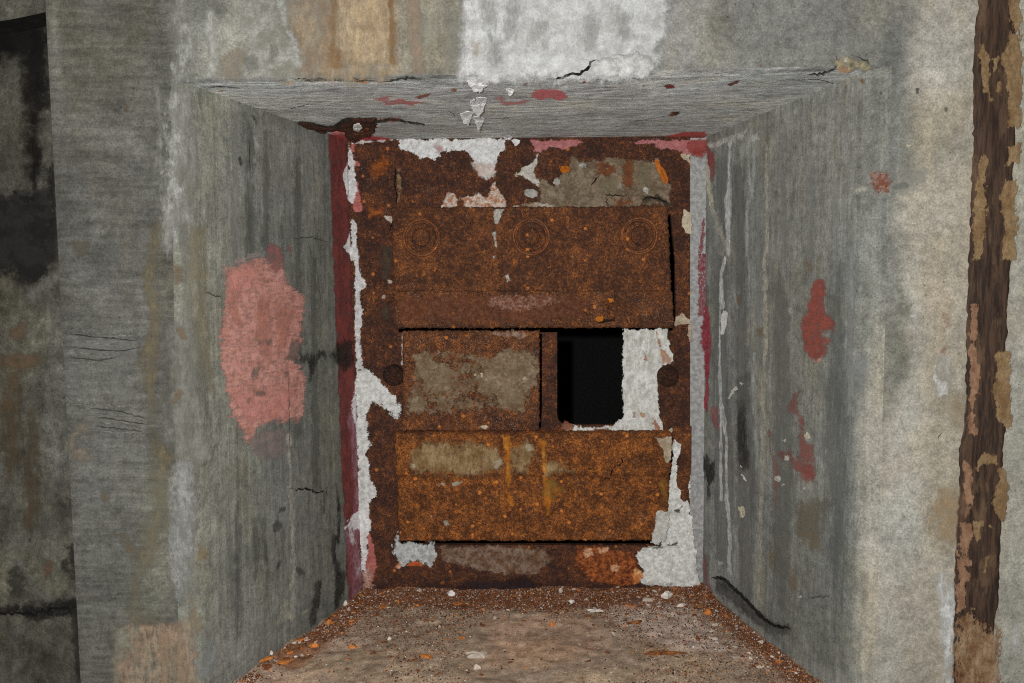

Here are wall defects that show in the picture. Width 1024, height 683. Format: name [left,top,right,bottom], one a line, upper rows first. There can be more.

crack [556,60,600,79]
water stain [48,162,56,234]
peeling [297,76,725,259]
rust [654,159,668,185]
peeling [344,219,592,575]
rust [500,435,514,506]
rust [539,439,560,515]
peeling [561,313,700,609]
rust [661,426,691,502]
crack [0,598,80,679]
rust [428,545,638,605]
crack [711,576,790,634]